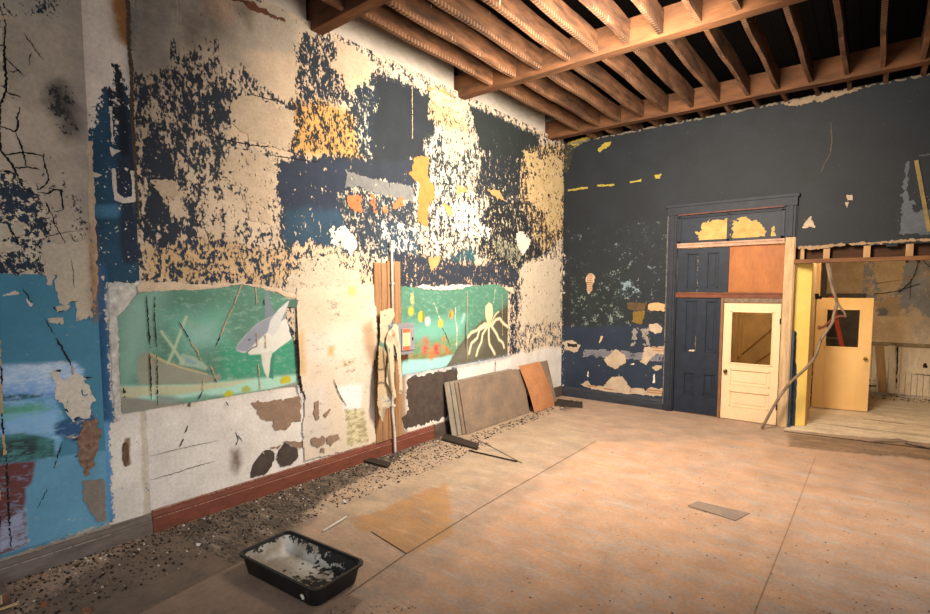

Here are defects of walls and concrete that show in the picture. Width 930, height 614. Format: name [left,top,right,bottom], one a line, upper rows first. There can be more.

peeling [330,36,374,83]
crack [0,20,77,302]
peeling [109,106,120,157]
peeling [218,89,299,225]
peeling [345,156,491,241]
peeling [427,85,479,165]
peeling [428,256,441,270]
peeling [41,141,361,522]
peeling [416,284,472,359]
flaking render [562,340,581,353]
flaking render [581,302,665,397]
flaking render [402,367,458,430]